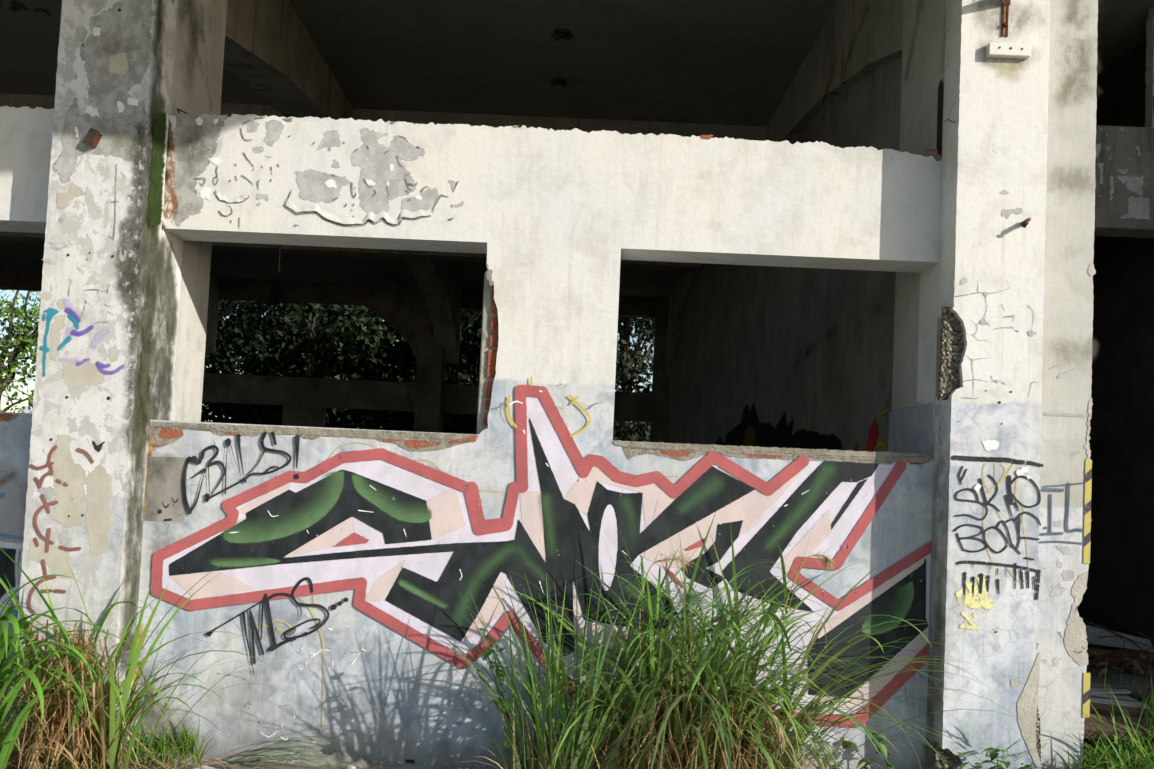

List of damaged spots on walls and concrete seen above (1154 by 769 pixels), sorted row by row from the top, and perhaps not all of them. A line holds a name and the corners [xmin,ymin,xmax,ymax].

peeling [52,0,152,223]
water stain [173,114,227,226]
peeling [212,117,293,228]
peeling [284,121,464,227]
peeling [1001,208,1022,219]
peeling [1095,126,1151,220]
water stain [115,0,198,671]
spalling [149,261,499,452]
spalling [937,306,964,400]
crack [955,280,1074,399]
peeling [28,434,112,578]
spalling [1010,545,1089,769]